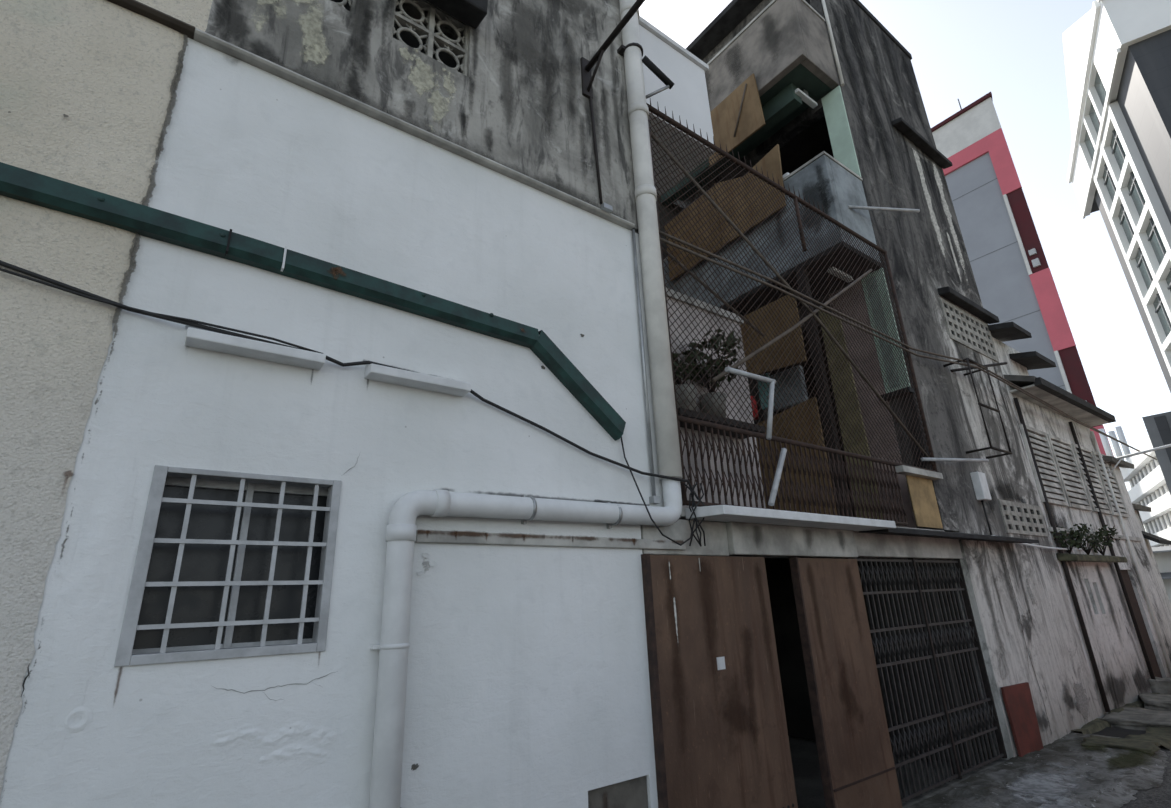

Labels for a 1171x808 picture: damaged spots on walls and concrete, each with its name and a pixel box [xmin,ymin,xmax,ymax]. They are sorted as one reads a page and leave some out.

damp [349,0,370,96]
damp [835,7,918,170]
damp [945,304,993,416]
rust [418,530,596,541]
damp [1014,553,1032,639]
damp [1097,562,1132,627]
crack [214,671,338,701]
damp [1107,668,1150,704]